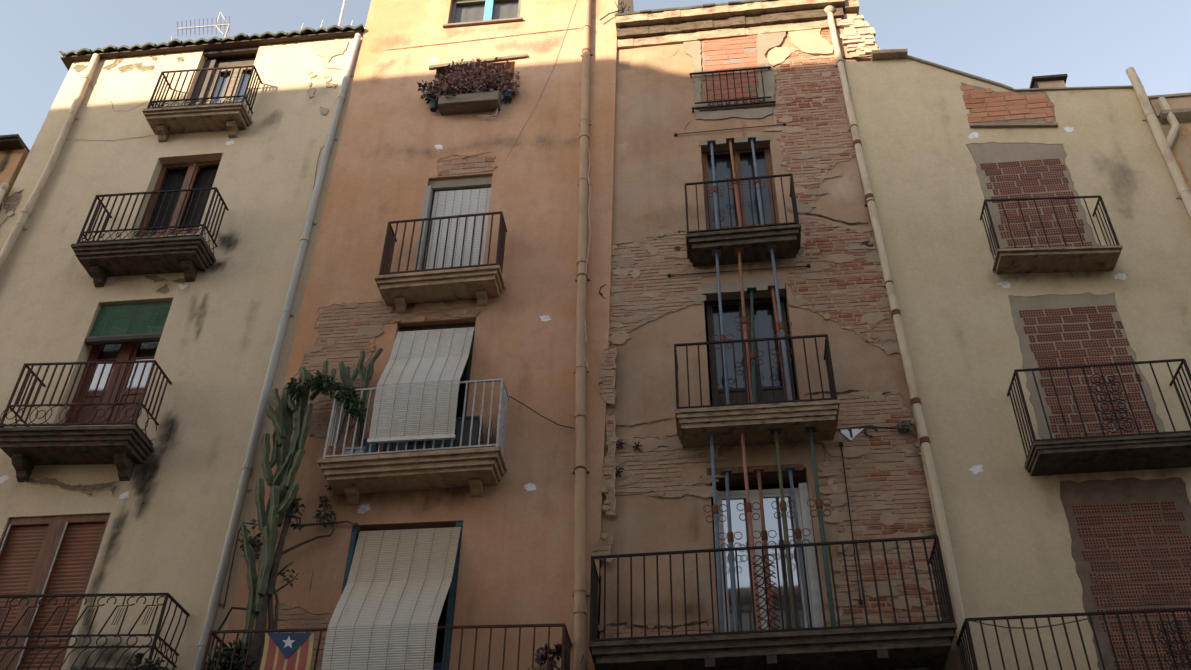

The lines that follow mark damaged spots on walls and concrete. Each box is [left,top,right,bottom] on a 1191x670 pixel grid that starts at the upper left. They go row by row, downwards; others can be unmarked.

flaking render [102,56,157,73]
crack [66,85,154,141]
flaking render [307,72,338,115]
peeling [2,189,24,217]
peeling [437,154,497,176]
peeling [762,28,900,354]
peeling [293,301,481,438]
peeling [599,228,730,516]
leakage [78,419,175,668]